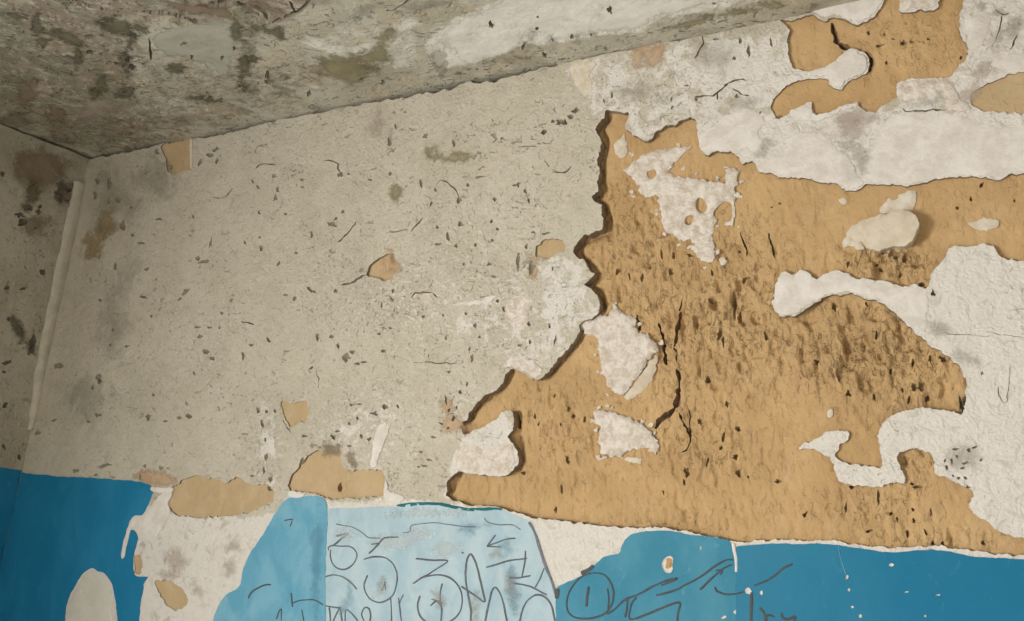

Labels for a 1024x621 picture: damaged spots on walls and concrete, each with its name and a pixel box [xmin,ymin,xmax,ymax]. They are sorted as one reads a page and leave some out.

water stain [7,12,88,70]
water stain [90,15,149,100]
water stain [168,0,285,41]
water stain [318,28,394,85]
crack [831,23,873,72]
flaking render [760,0,968,119]
flaking render [970,73,1024,115]
water stain [15,135,74,235]
flaking render [438,92,1024,556]
crack [636,298,692,453]
flaking render [121,401,309,574]
flaking render [289,403,399,500]